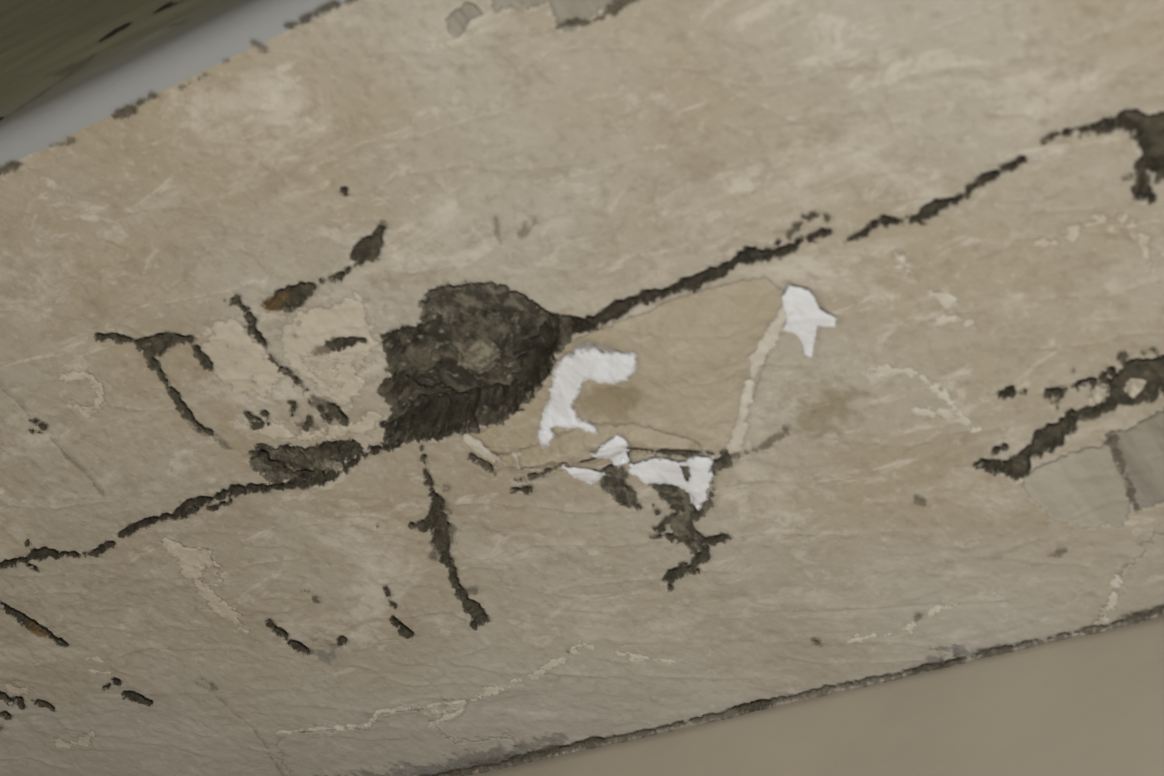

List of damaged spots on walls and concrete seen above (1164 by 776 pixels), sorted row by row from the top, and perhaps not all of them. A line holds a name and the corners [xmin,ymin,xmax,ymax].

spalling [446,0,637,38]
spalling [1040,109,1164,206]
crack [94,333,230,450]
crack [0,438,490,631]
crack [224,221,387,432]
spalling [200,281,593,484]
crack [467,427,790,592]
crack [570,156,1027,334]
spalling [973,348,1164,529]
peeling [1033,213,1161,284]
crack [0,602,68,648]
crack [265,619,311,655]